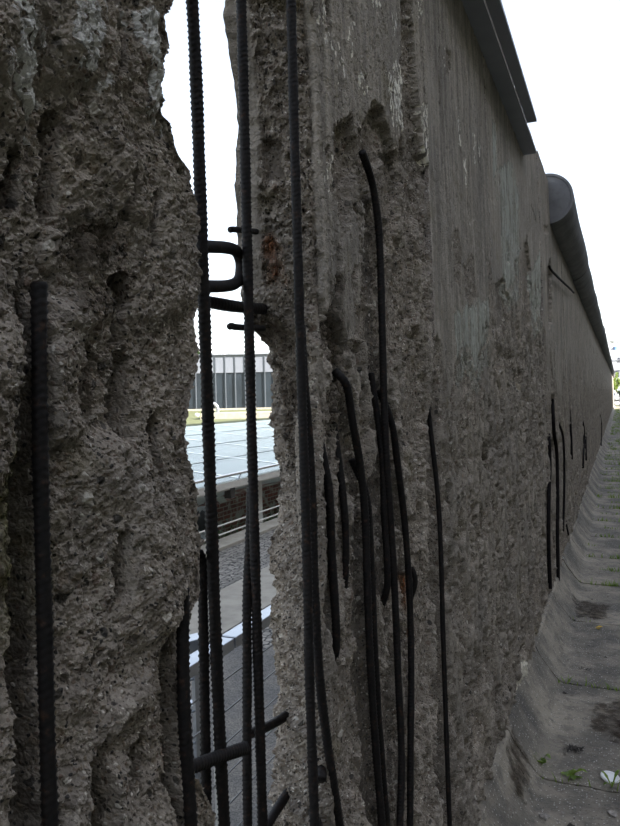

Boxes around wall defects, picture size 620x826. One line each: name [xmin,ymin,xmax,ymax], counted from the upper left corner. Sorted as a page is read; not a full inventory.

peeling [5,0,47,120]
peeling [73,0,114,94]
peeling [116,6,167,138]
spalling [29,281,60,826]
spalling [175,0,290,826]
spalling [262,0,430,826]
spalling [427,407,452,826]